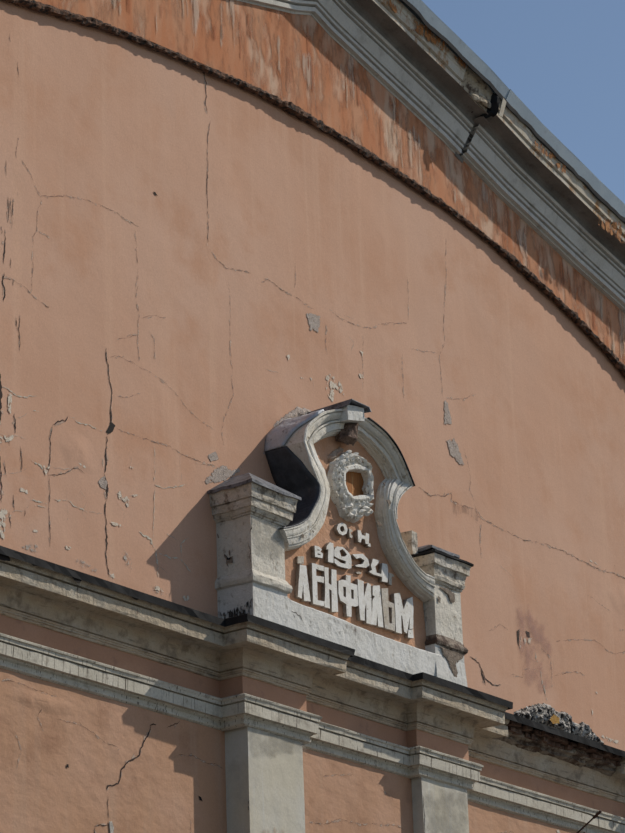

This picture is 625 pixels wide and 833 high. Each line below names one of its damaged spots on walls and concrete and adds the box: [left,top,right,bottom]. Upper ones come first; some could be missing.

crack [203,71,409,383]
crack [0,138,234,575]
flaking render [205,452,242,484]
crack [424,454,623,577]
crack [65,721,180,833]
flaking render [440,646,465,677]
crack [471,657,523,686]
flaking render [492,675,622,776]